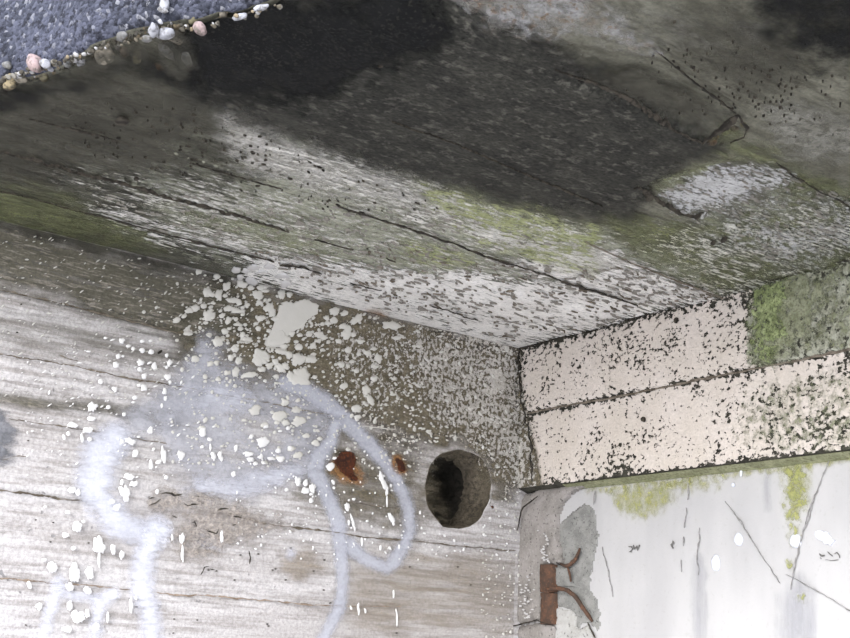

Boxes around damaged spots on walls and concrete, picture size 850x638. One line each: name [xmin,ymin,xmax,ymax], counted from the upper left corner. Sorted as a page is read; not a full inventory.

leakage [665,0,850,96]
spalling [702,63,807,146]
leakage [766,106,850,159]
leakage [0,0,727,528]
peeling [68,108,850,508]
corrosion [330,451,363,485]
corrosion [392,455,406,474]